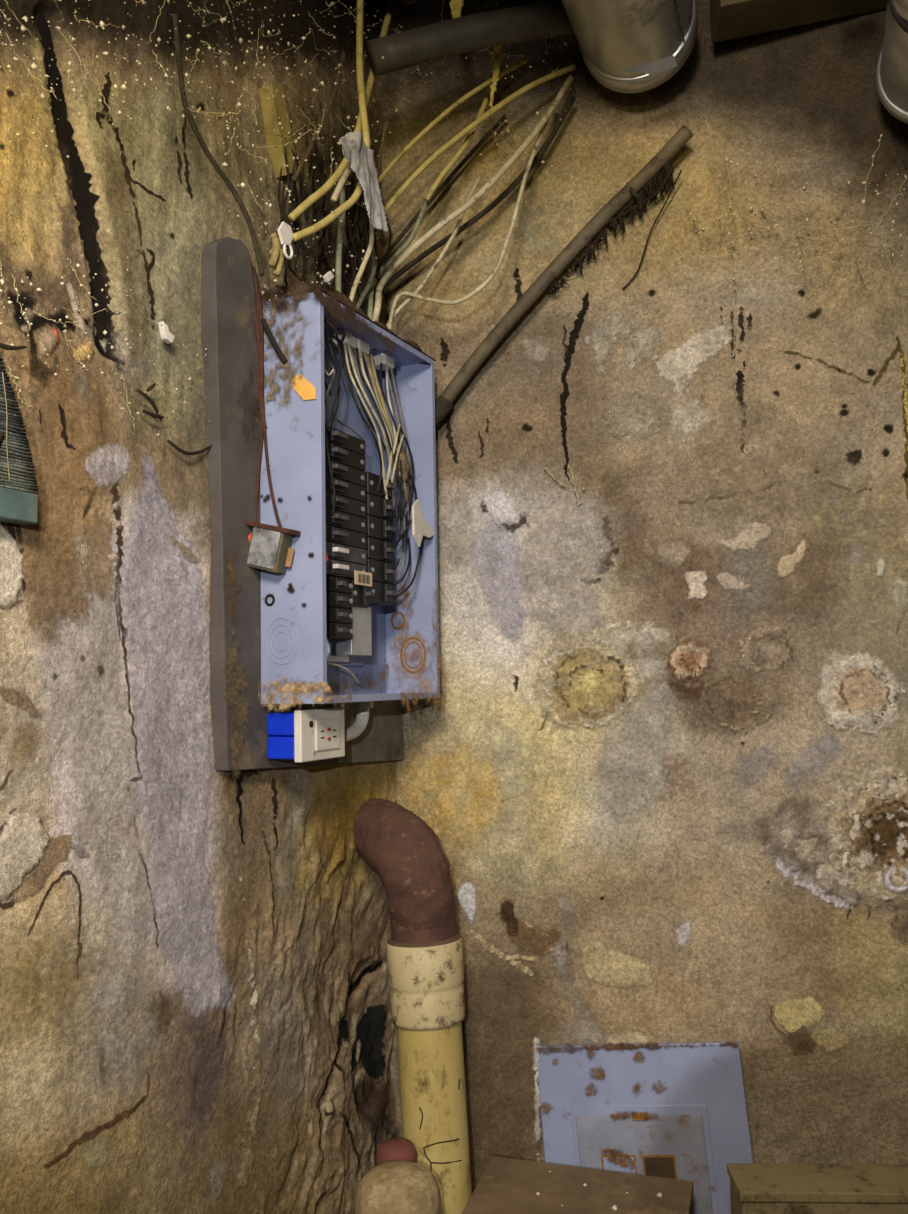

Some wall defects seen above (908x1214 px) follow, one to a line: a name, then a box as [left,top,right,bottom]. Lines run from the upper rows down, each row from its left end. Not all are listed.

crack [33,11,166,368]
peeling [85,444,131,487]
crack [560,291,589,481]
crack [784,336,908,499]
rust [667,638,713,696]
peeling [0,462,234,1081]
damp [780,826,872,890]
damp [849,783,890,840]
crack [27,870,82,980]
spalling [330,1000,344,1027]
crack [43,1072,150,1168]
spalling [283,1040,365,1194]